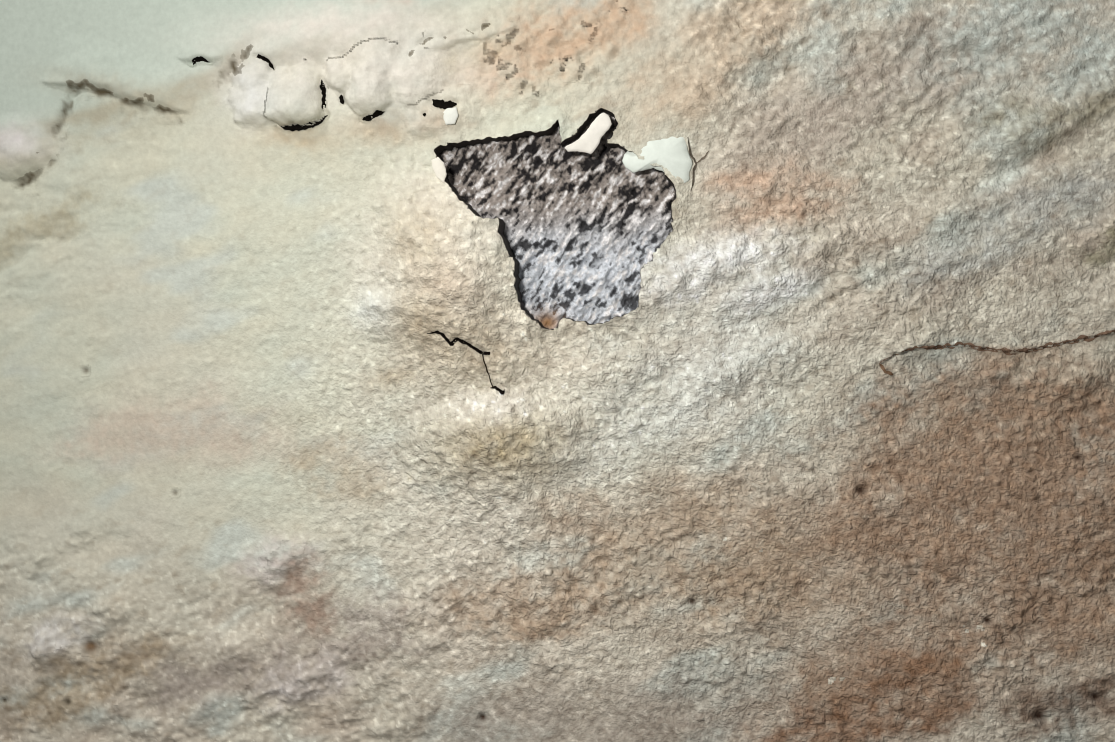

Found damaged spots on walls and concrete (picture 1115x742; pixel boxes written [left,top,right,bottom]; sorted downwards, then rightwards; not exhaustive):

spalling [431,108,693,331]
crack [427,330,505,394]
crack [879,330,1115,376]